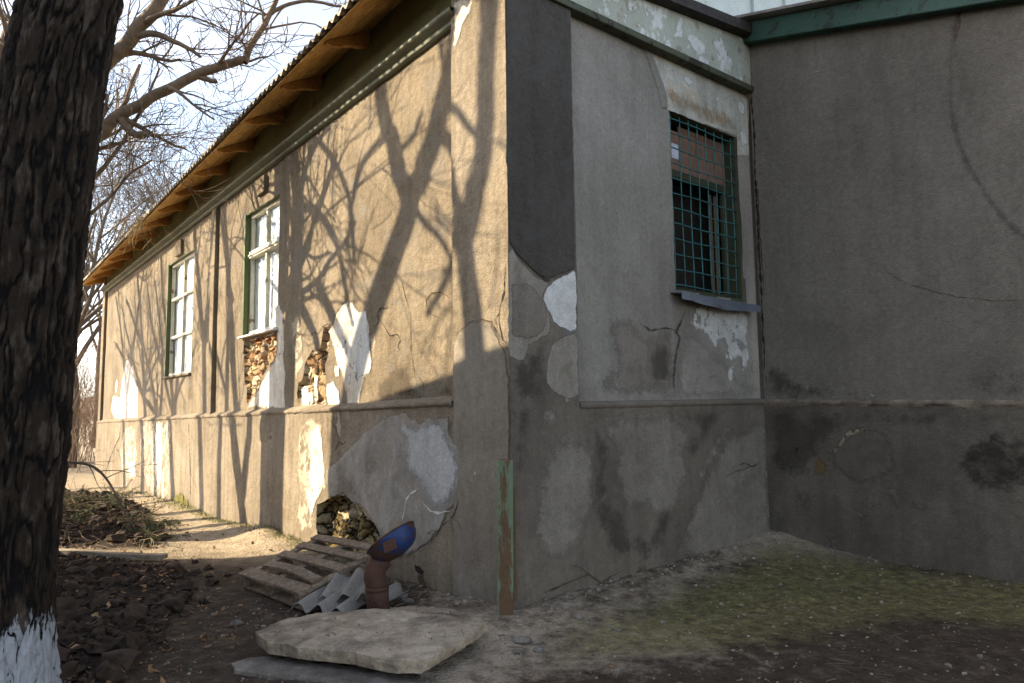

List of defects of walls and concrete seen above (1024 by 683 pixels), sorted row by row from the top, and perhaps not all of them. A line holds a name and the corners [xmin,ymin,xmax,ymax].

flaking render [645,7,750,156]
flaking render [243,301,375,436]
crack [375,275,505,388]
flaking render [544,271,577,331]
crack [641,313,685,390]
peeling [694,304,759,381]
spalling [297,419,380,553]